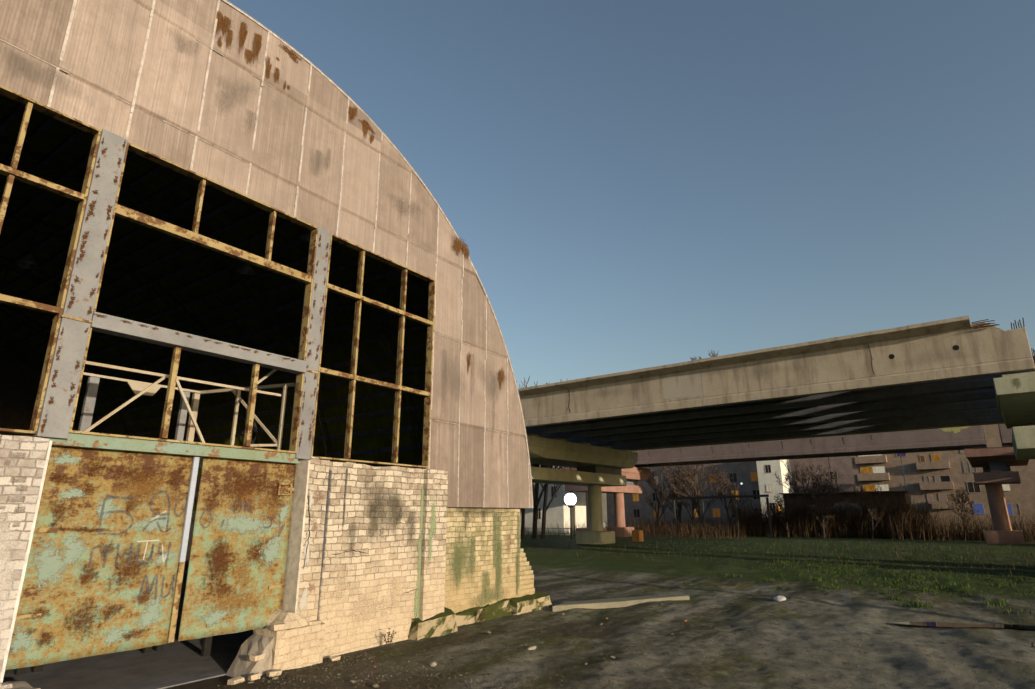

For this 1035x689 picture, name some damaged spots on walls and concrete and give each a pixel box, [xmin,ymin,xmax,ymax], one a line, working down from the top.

corrosion [216,11,302,90]
corrosion [66,190,112,313]
corrosion [452,235,469,259]
corrosion [41,327,76,433]
corrosion [50,500,104,532]
corrosion [64,543,153,640]
corrosion [51,459,185,511]
corrosion [201,540,265,619]
corrosion [203,472,285,518]
damp [455,514,500,596]